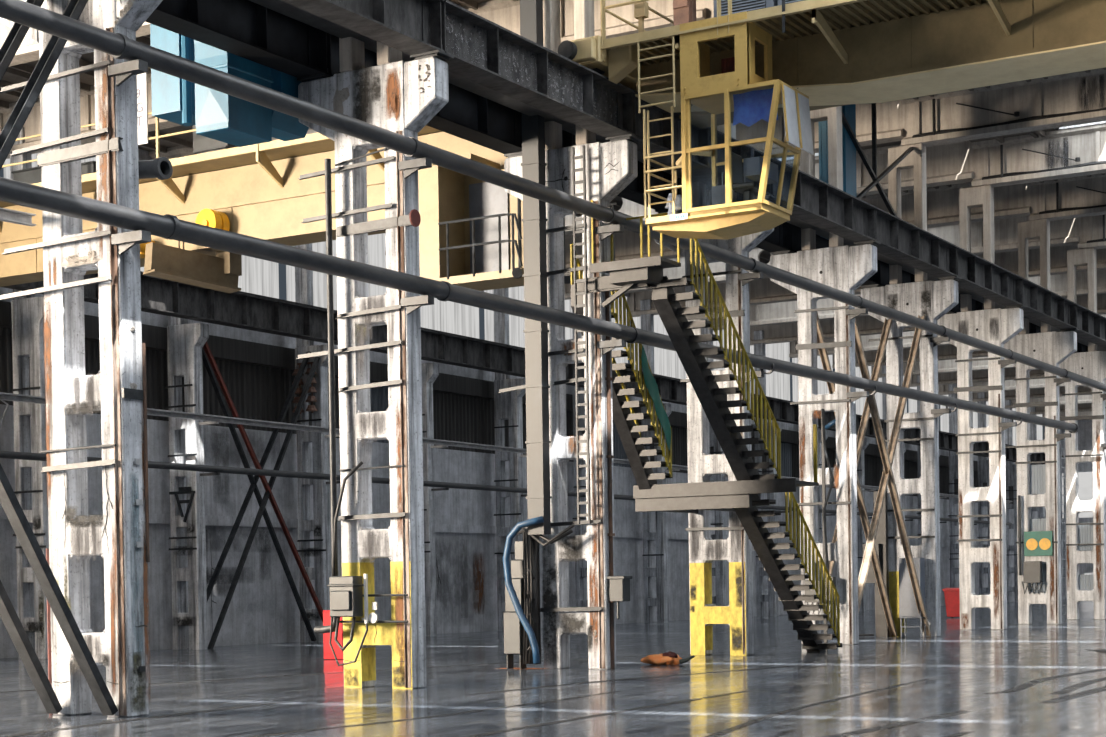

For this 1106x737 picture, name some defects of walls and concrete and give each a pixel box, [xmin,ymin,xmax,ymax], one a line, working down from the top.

corrosion [386,70,401,120]
corrosion [473,555,484,613]